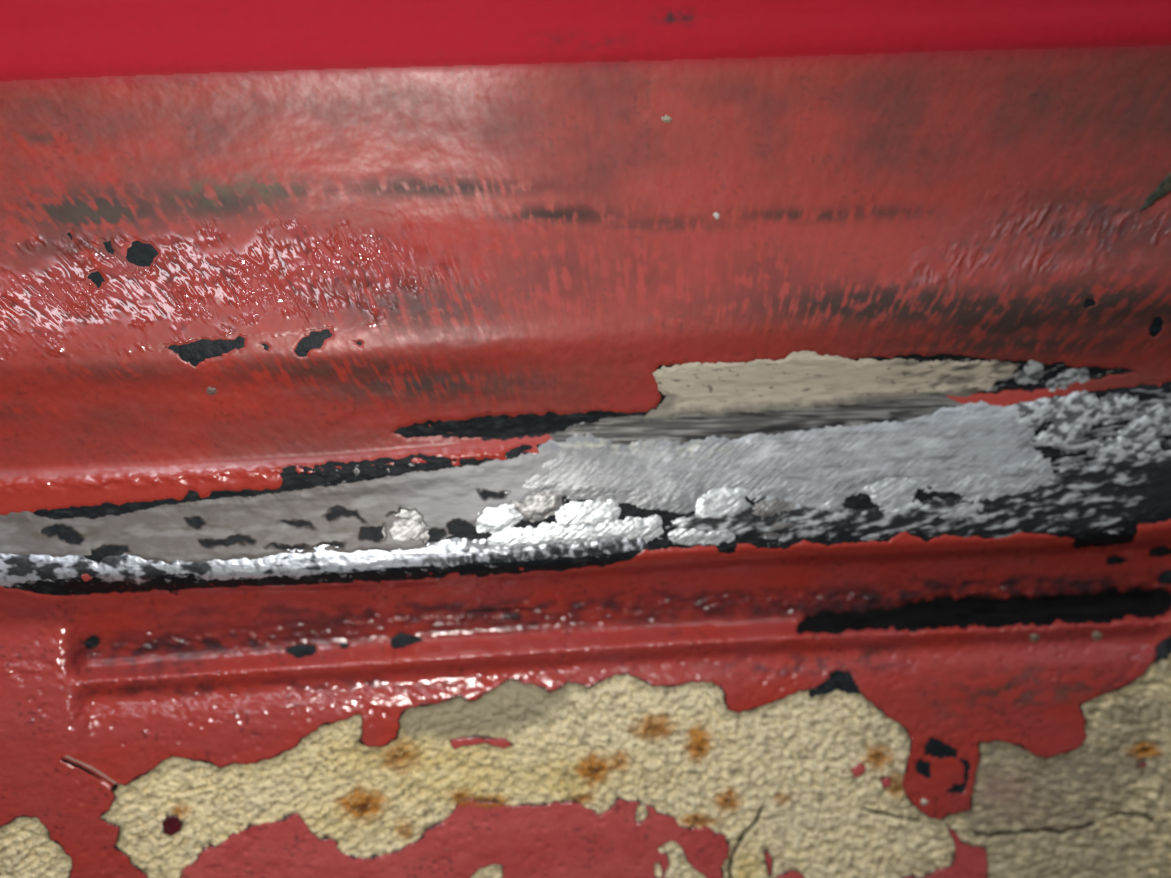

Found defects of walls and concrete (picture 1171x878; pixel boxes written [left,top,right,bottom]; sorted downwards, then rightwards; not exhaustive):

peeling [165,336,245,367]
peeling [646,351,1018,419]
peeling [796,546,1171,635]
peeling [0,817,71,878]
corrosion [575,754,625,802]
peeling [101,632,1171,878]
corrosion [640,715,670,737]
corrosion [685,728,710,759]
corrosion [717,789,737,809]
crack [727,807,762,878]
crack [862,807,920,822]
crack [974,813,1154,837]